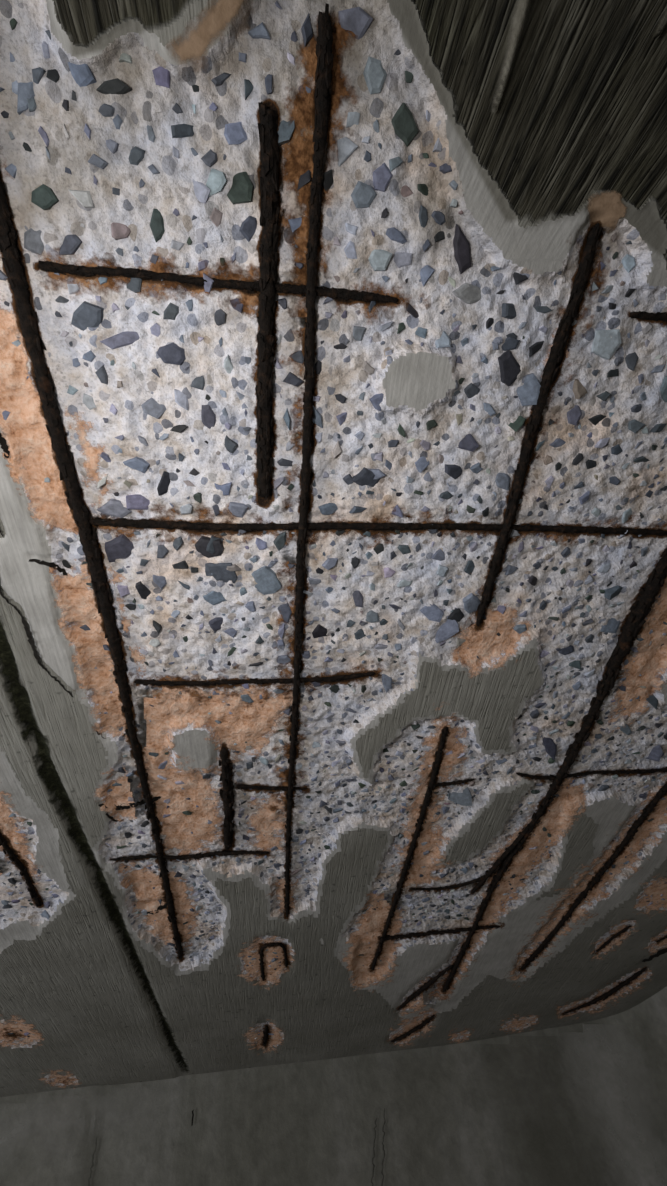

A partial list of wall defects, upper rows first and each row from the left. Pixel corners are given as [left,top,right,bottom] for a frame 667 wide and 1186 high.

rust [280,16,357,337]
rust [43,248,259,316]
rust [0,308,79,534]
rust [49,560,382,859]
spalling [0,746,76,954]
rust [118,862,201,948]
spalling [240,935,294,985]
spalling [389,1008,442,1044]
rust [390,778,586,1048]
rust [510,775,667,987]
spalling [558,967,652,1016]
spalling [594,920,636,954]